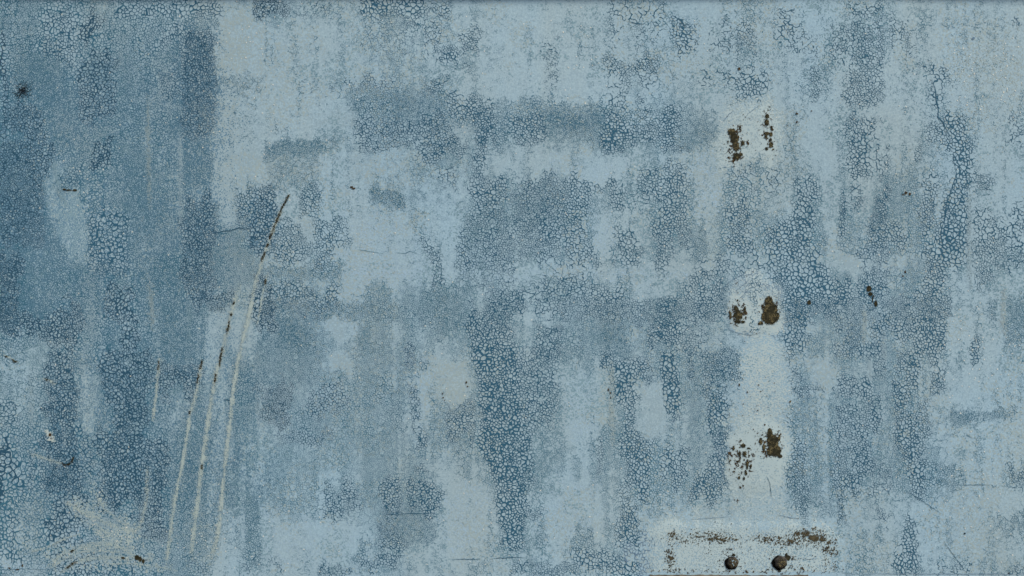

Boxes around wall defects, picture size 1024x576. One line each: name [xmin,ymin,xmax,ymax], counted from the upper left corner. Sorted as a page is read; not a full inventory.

crack [19,1,105,92]
crack [359,0,484,73]
crack [698,14,769,114]
rust [725,124,749,167]
rust [762,106,774,150]
crack [830,1,923,252]
crack [0,15,747,576]
rust [728,296,781,328]
crack [724,60,1024,526]
rust [726,424,784,503]
rust [651,526,859,575]
crack [846,508,1024,576]